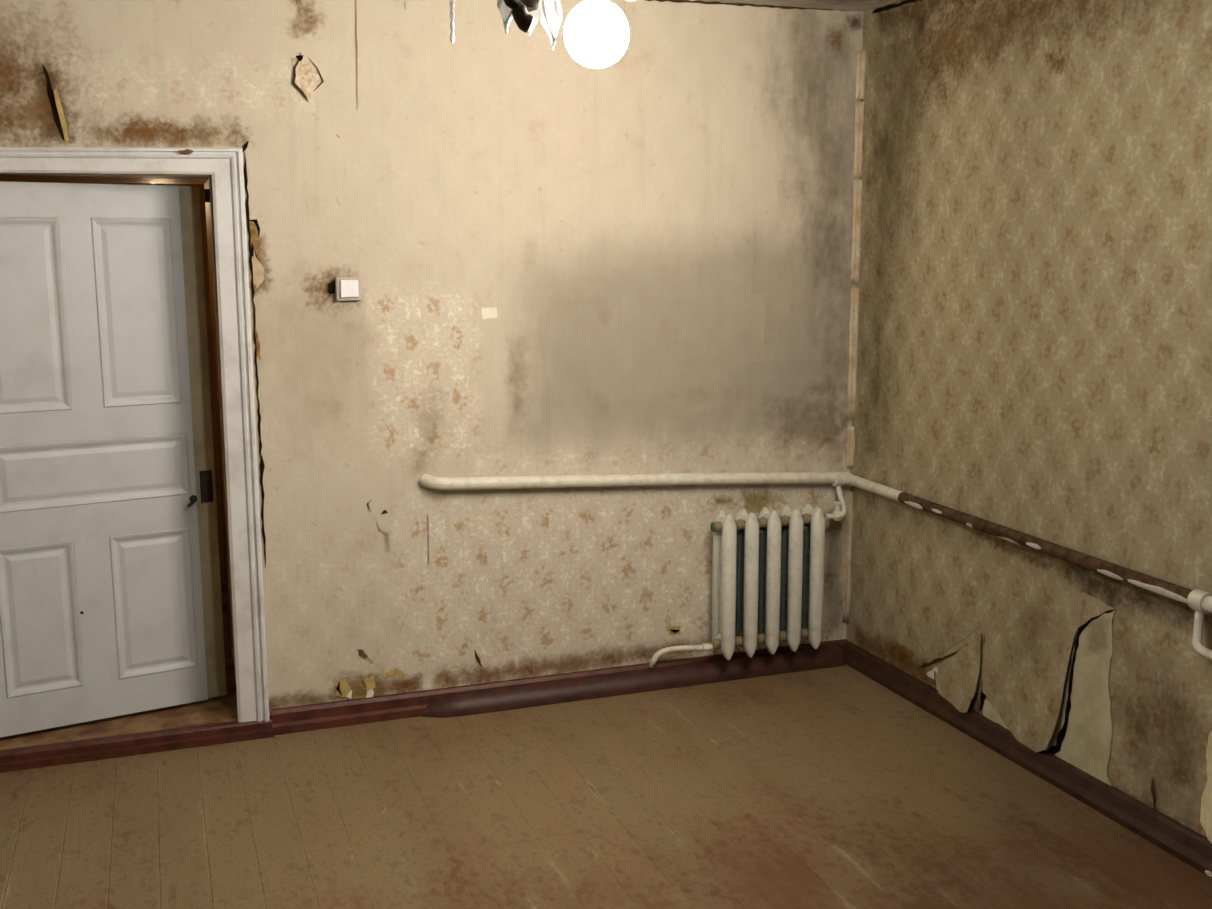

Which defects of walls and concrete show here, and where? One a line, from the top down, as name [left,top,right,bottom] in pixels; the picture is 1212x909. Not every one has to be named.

water stain [916,0,1105,85]
water stain [0,56,60,141]
water stain [99,122,238,144]
peeling [336,649,405,699]
water stain [352,678,420,696]
water stain [440,649,657,686]
peeling [916,592,1116,786]